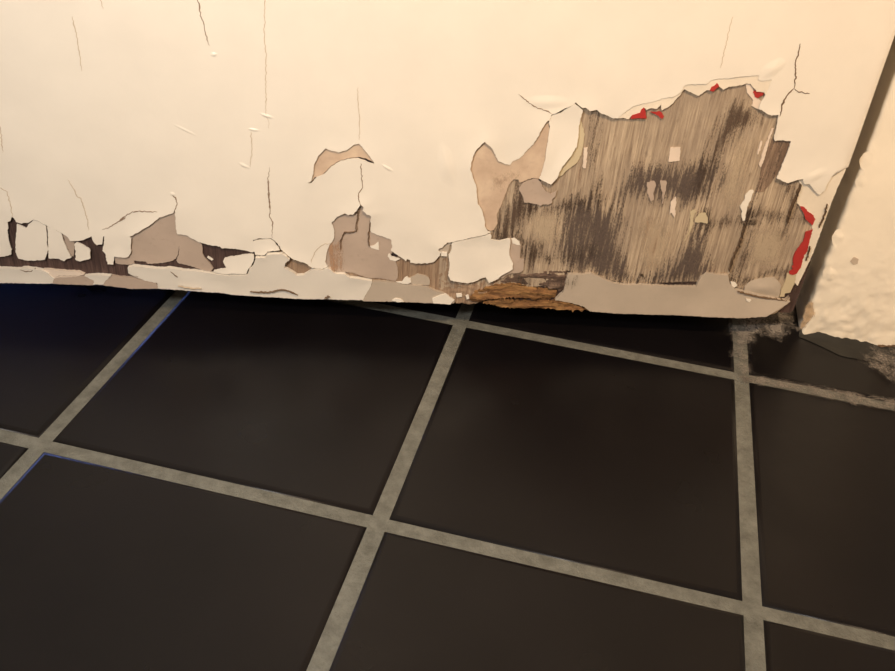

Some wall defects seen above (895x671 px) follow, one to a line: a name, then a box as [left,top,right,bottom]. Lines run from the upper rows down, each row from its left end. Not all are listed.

crack [780,45,810,116]
peeling [309,144,373,183]
peeling [325,75,846,318]
leakage [496,99,789,286]
peeling [0,210,312,289]
leakage [731,312,794,357]
leakage [743,369,895,408]
leakage [865,350,895,378]